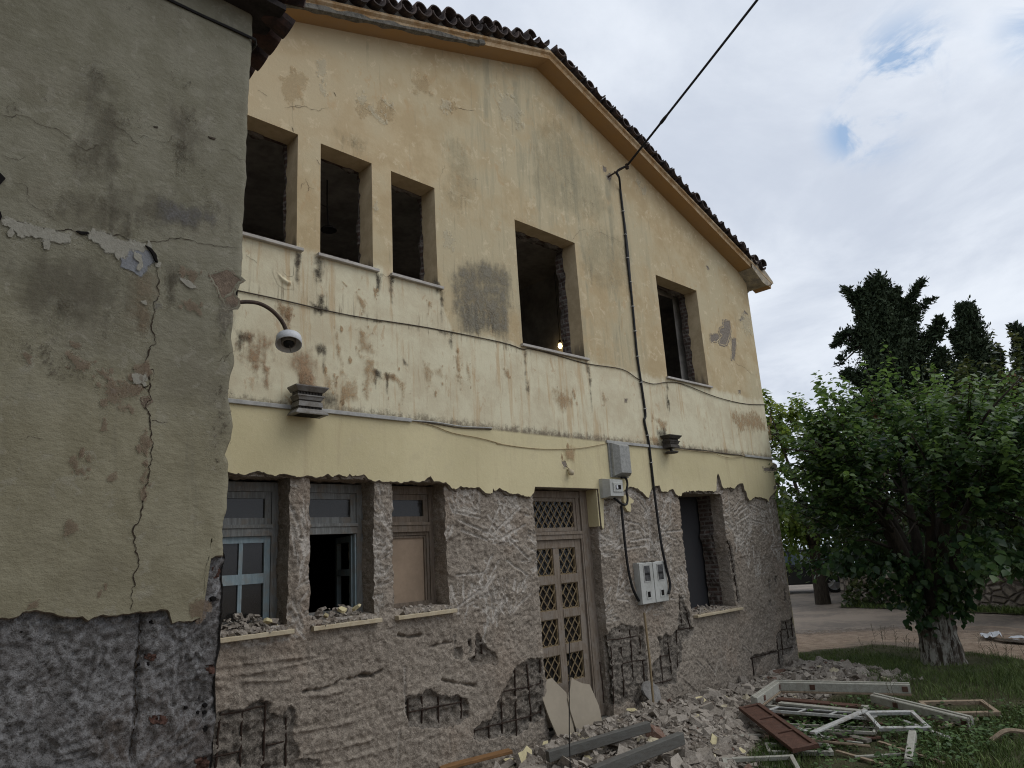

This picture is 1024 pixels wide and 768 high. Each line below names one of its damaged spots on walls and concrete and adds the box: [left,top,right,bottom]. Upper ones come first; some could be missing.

peeling [1,216,72,250]
peeling [87,228,161,276]
spalling [207,266,246,311]
leakage [436,261,509,334]
spalling [709,310,748,361]
crack [129,268,167,766]
spalling [228,462,778,530]
spalling [453,633,499,666]
spalling [599,595,693,708]
spalling [750,617,796,678]
spalling [212,699,322,768]
spalling [405,658,545,741]